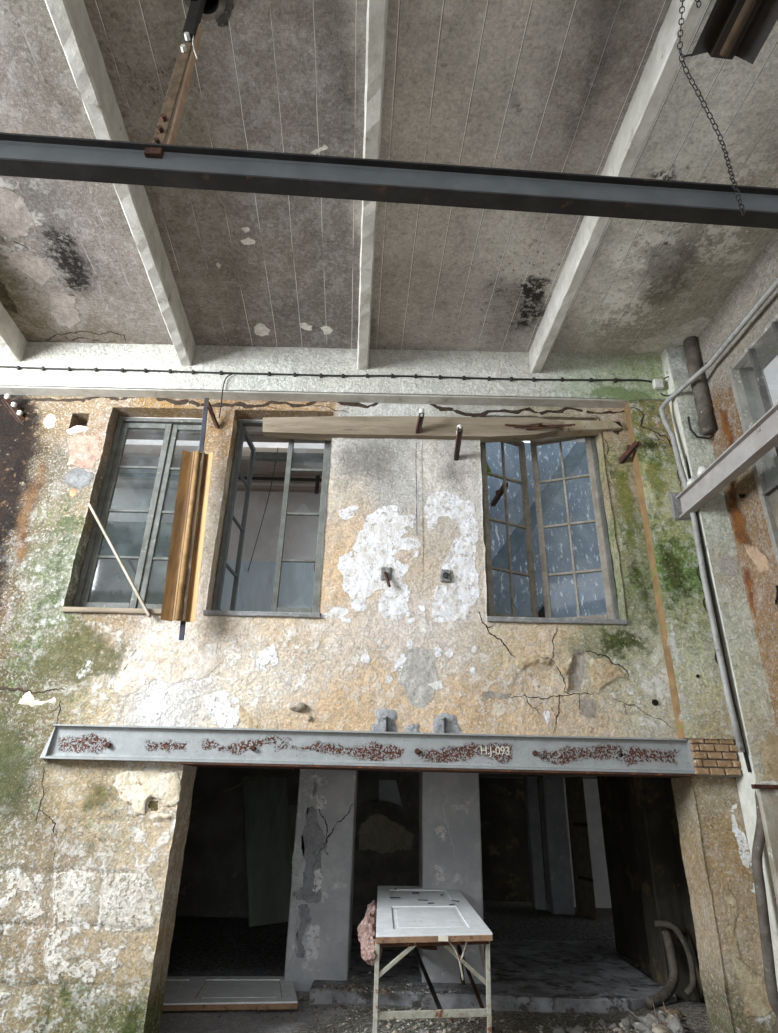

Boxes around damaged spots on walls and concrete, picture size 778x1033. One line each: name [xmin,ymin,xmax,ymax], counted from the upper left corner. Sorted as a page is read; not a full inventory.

damp [44,231,89,290]
damp [513,275,550,328]
crack [11,395,378,413]
crack [430,404,672,478]
damp [0,395,40,585]
peeling [321,490,481,624]
peeling [385,639,453,709]
crack [510,628,671,733]
rust [59,733,113,754]
rust [202,735,404,761]
rust [418,742,513,764]
spalling [286,771,328,972]